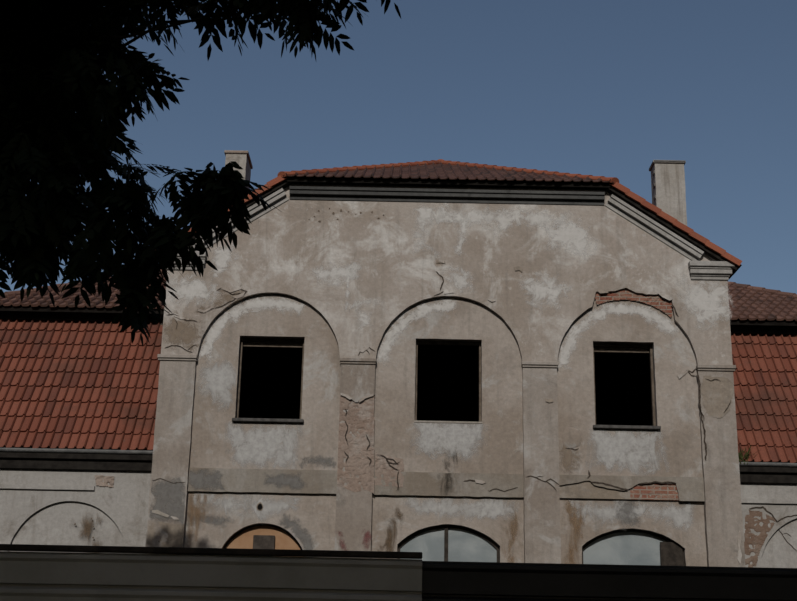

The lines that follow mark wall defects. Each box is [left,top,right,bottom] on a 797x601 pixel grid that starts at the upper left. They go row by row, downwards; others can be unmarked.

crack [434,262,454,296]
flaking render [595,288,673,317]
flaking render [337,393,404,494]
water stain [385,512,401,559]
flaking render [737,506,778,567]
crack [778,515,797,551]